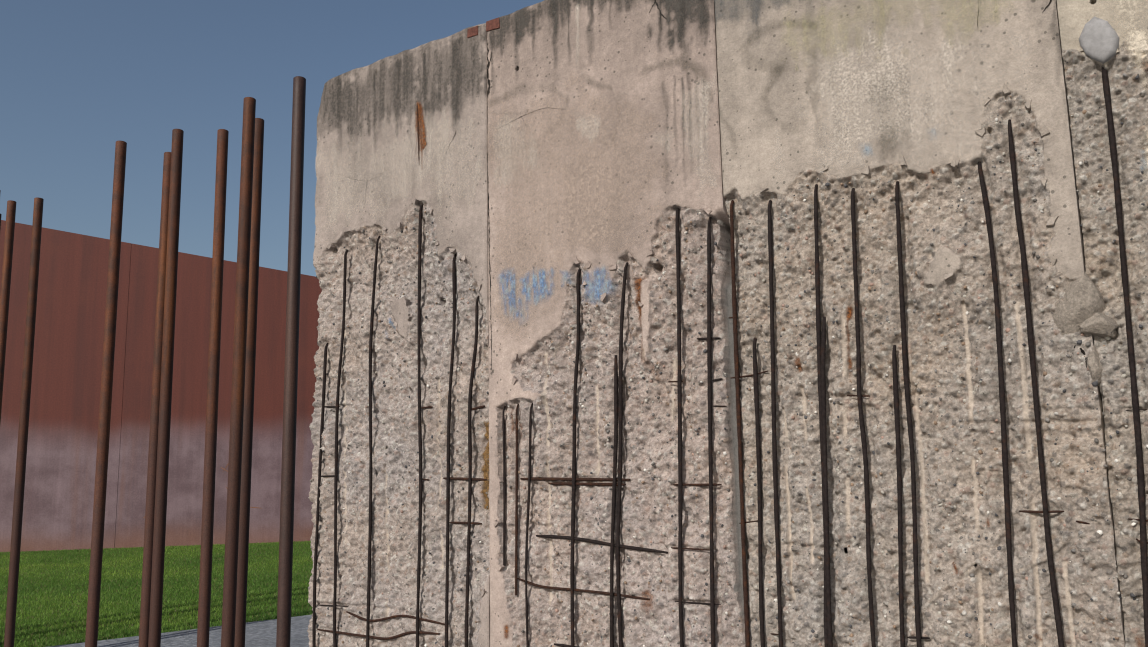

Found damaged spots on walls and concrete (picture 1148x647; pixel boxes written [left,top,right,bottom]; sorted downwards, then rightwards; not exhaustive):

corrosion [416,102,426,149]
water stain [323,0,604,157]
water stain [648,0,761,48]
spalling [307,41,1148,647]